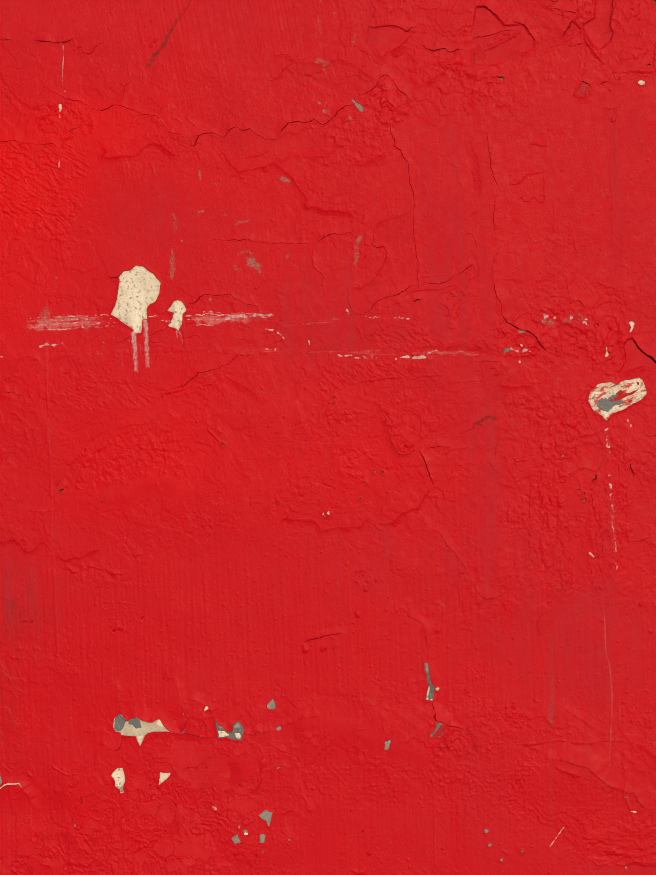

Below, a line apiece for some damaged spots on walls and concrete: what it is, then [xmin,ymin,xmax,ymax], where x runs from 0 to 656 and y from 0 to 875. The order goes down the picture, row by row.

leakage [32,314,105,330]
peeling [108,257,189,336]
crack [109,317,201,347]
crack [181,286,267,324]
leakage [187,311,271,326]
spalling [475,306,656,423]
crack [371,399,447,486]
crack [580,403,600,432]
crack [559,452,624,597]
peeling [110,668,322,749]
peeling [95,766,138,795]
peeling [198,805,288,875]